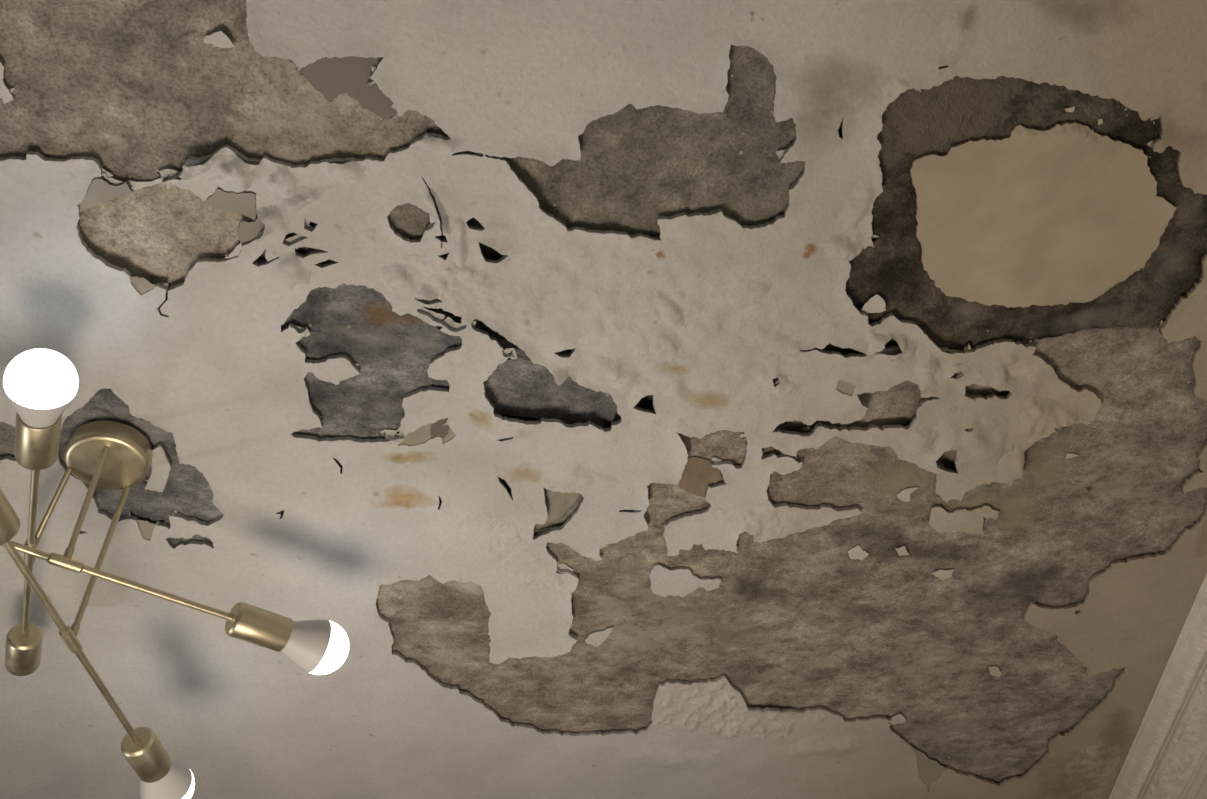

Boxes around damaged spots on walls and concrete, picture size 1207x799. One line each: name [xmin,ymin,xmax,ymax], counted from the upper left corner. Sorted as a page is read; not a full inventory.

peeling [0,0,448,308]
peeling [501,45,804,237]
peeling [0,422,16,457]
peeling [59,388,223,540]
peeling [281,283,621,446]
peeling [376,76,1207,791]